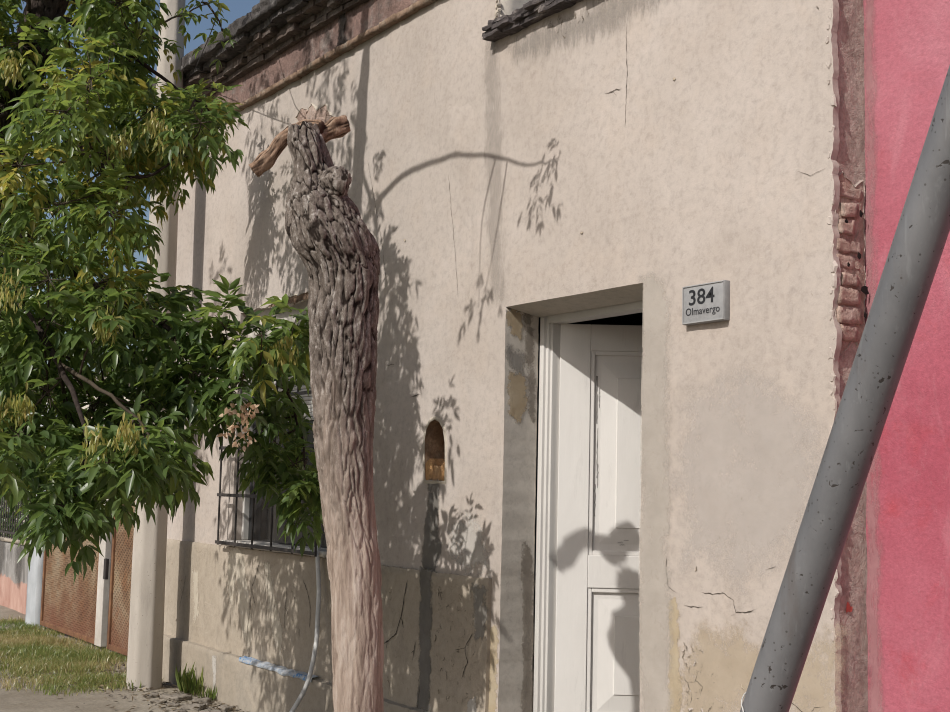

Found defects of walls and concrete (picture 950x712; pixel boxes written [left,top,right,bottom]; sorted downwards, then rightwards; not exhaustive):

spalling [817,6,837,108]
spalling [827,171,869,360]
peeling [506,309,523,339]
peeling [507,372,528,423]
spalling [828,372,837,411]
crack [385,583,416,660]
peeling [667,598,723,712]
crack [666,558,753,616]
spalling [829,569,839,654]